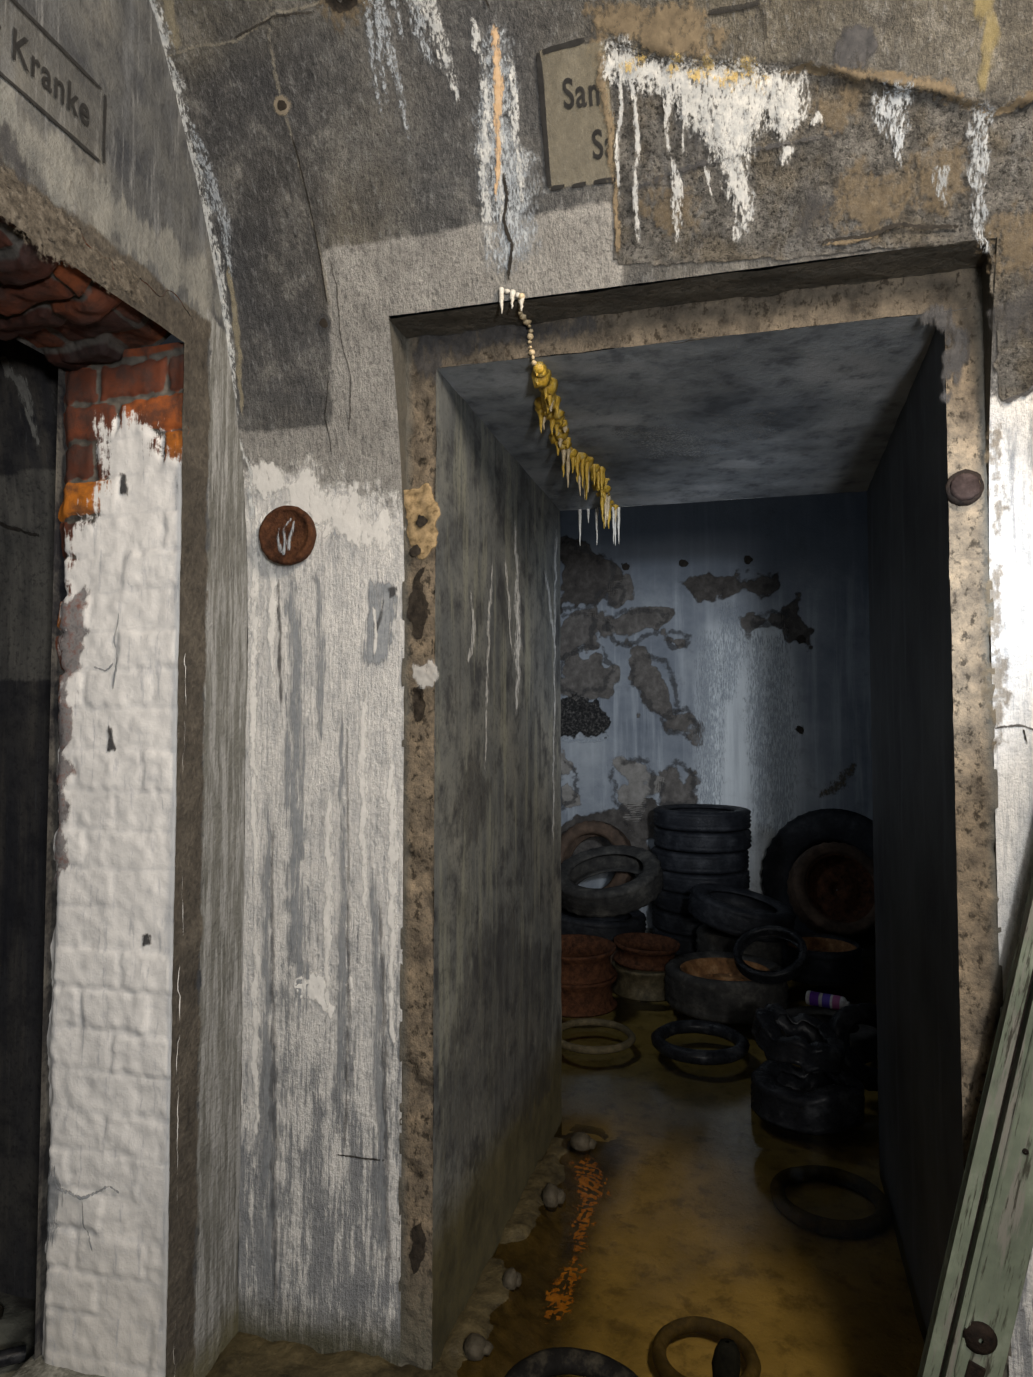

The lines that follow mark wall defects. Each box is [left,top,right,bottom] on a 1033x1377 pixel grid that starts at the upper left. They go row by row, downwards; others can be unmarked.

crack [166,1,325,58]
efflorescence [363,0,459,139]
efflorescence [471,18,535,280]
water stain [582,0,822,242]
efflorescence [872,83,914,165]
water stain [967,0,998,252]
peeling [120,473,128,495]
peeling [560,535,705,856]
peeling [679,555,814,649]
water stain [259,575,326,1276]
water stain [337,720,349,1114]
water stain [370,872,388,1251]